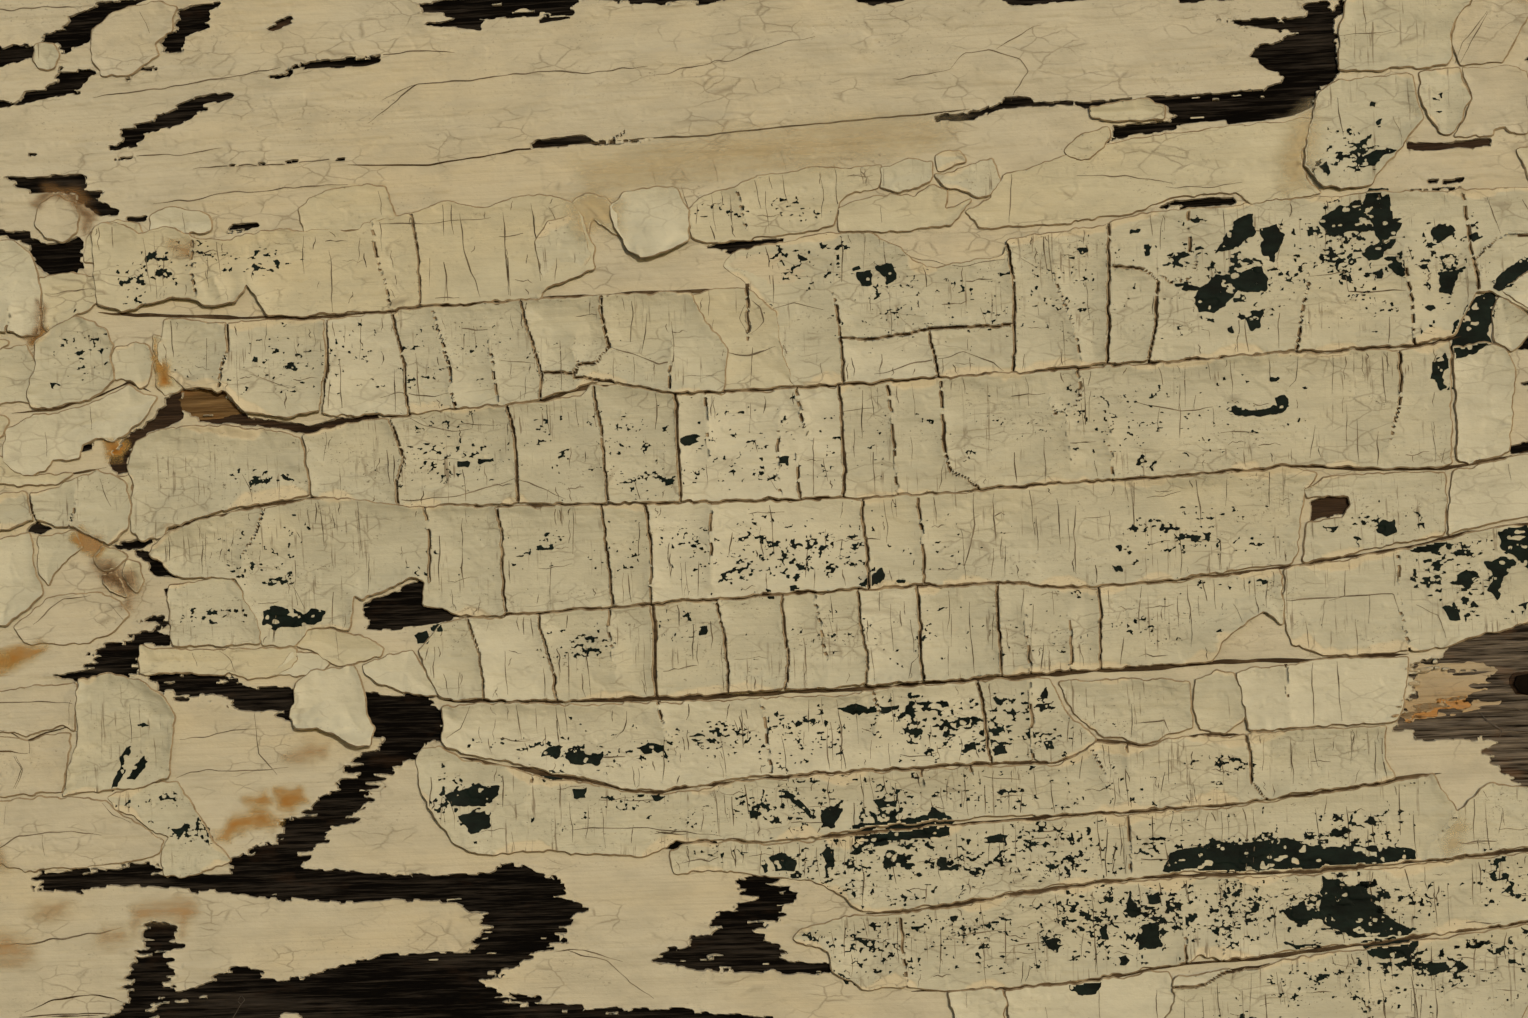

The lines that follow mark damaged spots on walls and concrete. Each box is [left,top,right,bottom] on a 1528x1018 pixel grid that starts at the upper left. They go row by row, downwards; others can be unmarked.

peeling [420,0,579,31]
peeling [0,0,221,108]
peeling [270,56,381,79]
peeling [935,0,1528,140]
crack [98,289,709,320]
peeling [0,72,1528,703]
crack [460,523,1528,618]
crack [443,653,1407,704]
peeling [0,524,1528,1018]
crack [461,739,1153,794]
crack [866,848,1528,914]
crack [911,921,1528,992]